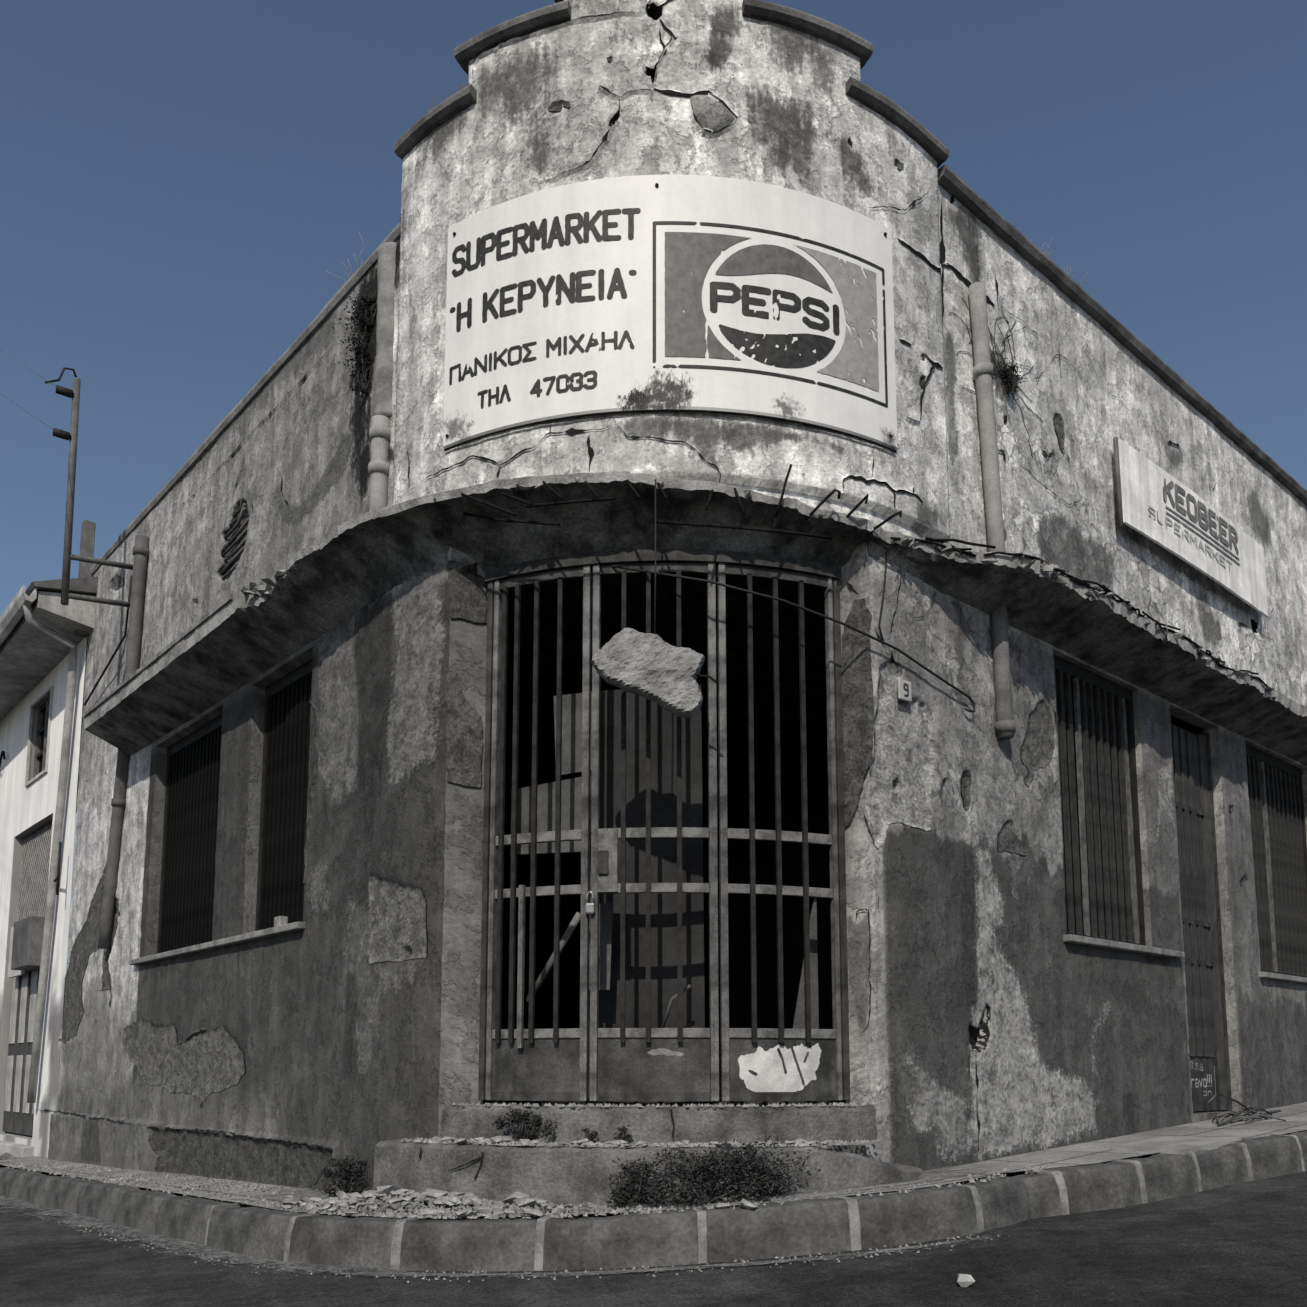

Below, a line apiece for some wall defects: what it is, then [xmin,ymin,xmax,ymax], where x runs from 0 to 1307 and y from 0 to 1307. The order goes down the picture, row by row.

crack [472,0,740,183]
crack [866,187,1131,505]
flaking render [59,866,120,1044]
flaking render [122,1019,245,1102]
flaking render [342,875,427,1073]
crack [969,1051,980,1150]
peeling [909,700,1096,1159]